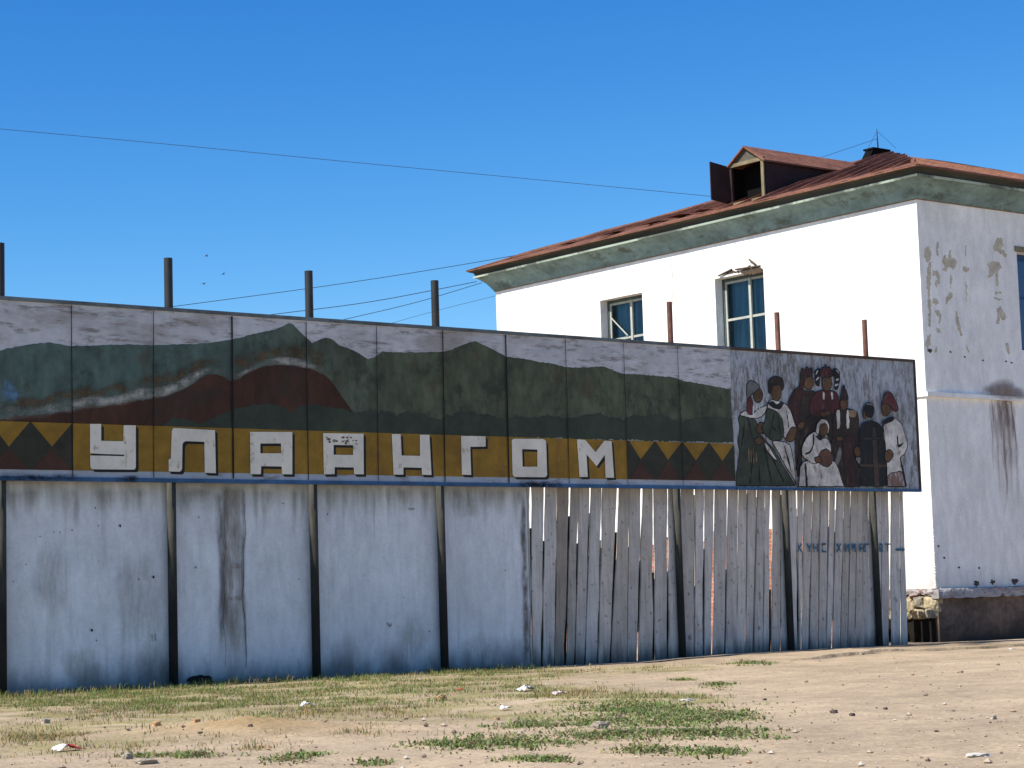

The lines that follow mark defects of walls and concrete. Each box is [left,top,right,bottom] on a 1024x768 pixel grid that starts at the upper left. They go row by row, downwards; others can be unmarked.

peeling [924,241,969,357]
peeling [987,238,1007,324]